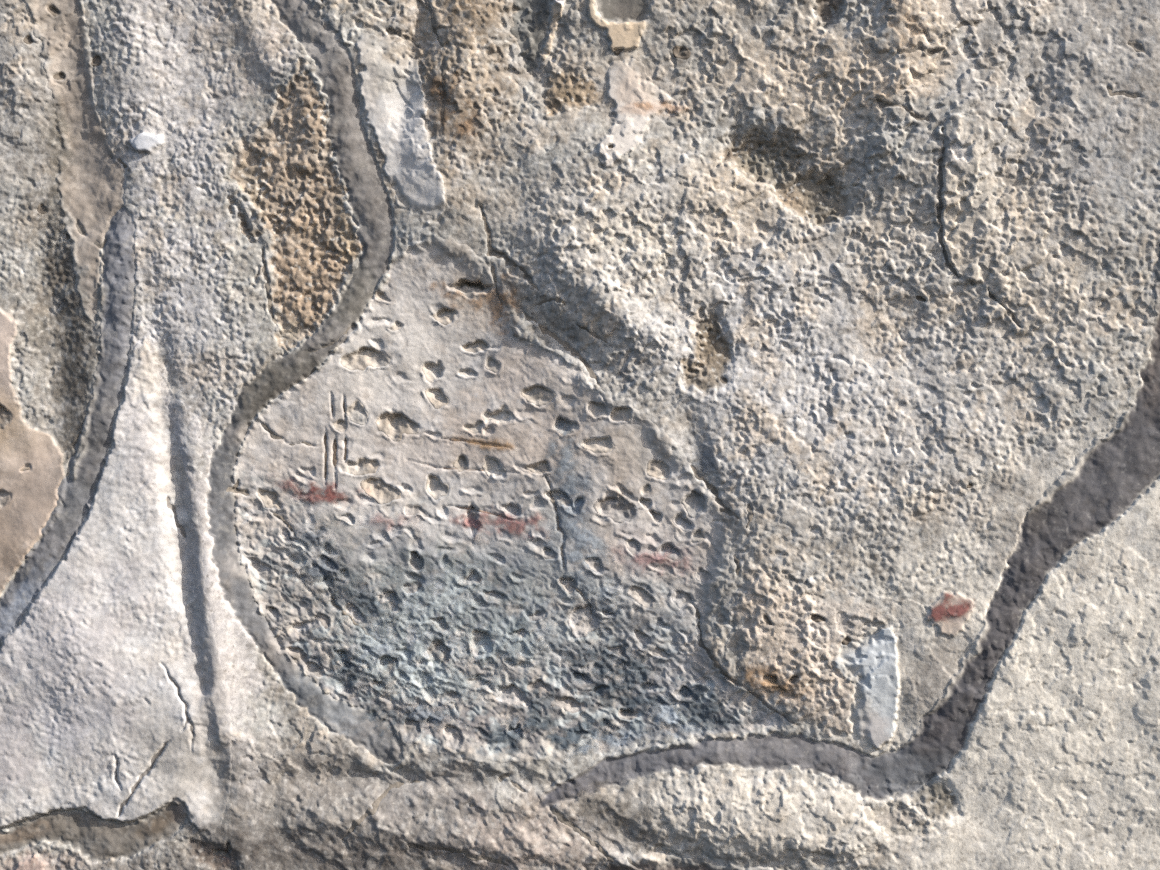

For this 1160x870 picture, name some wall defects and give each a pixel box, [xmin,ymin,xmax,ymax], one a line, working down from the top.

spalling [227,55,364,352]
crack [875,97,1021,327]
spalling [0,405,12,429]
crack [115,671,194,817]